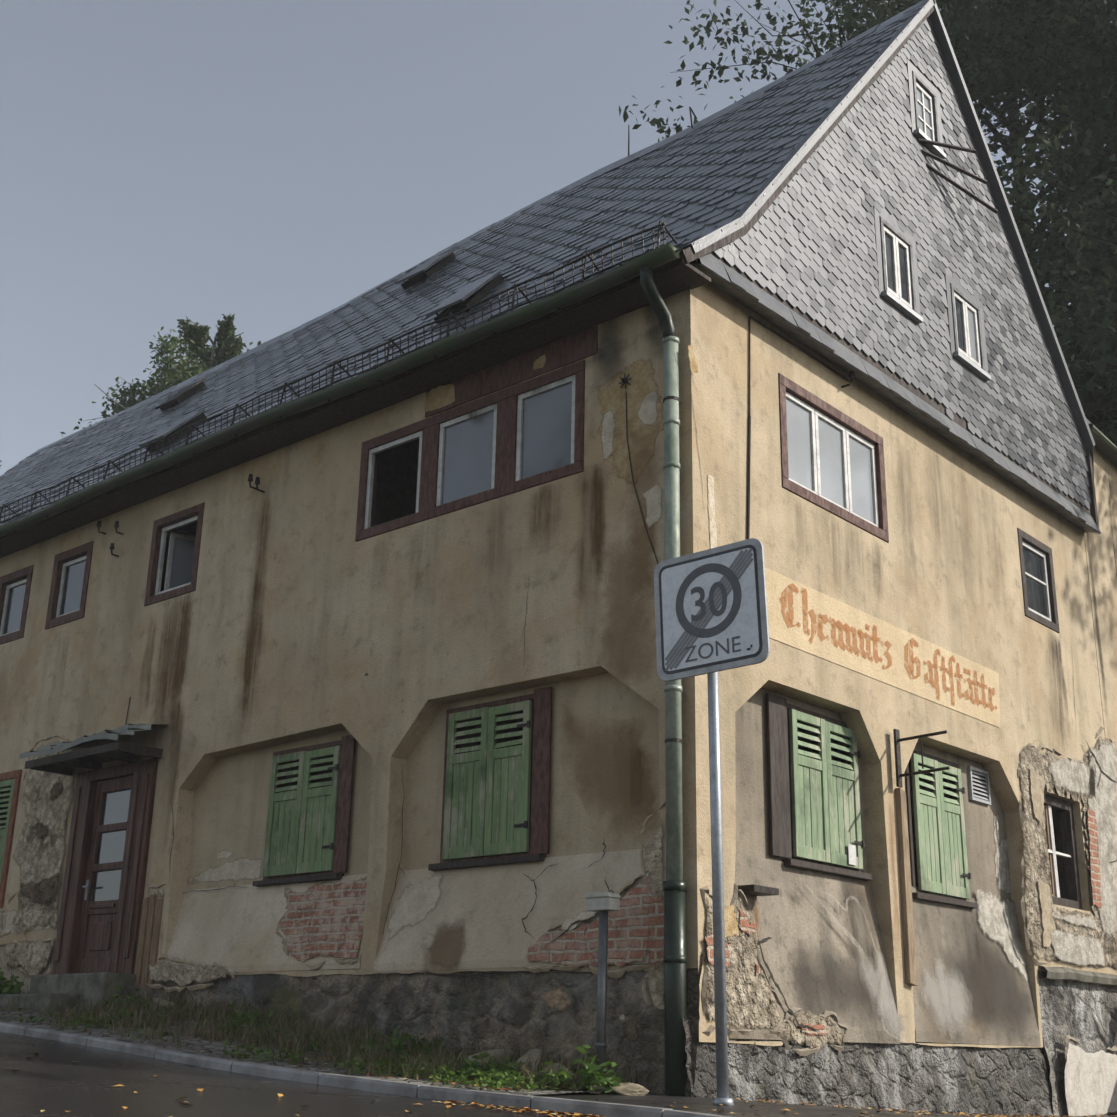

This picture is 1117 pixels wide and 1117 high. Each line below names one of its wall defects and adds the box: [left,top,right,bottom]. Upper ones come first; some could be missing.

peeling [598,359,664,527]
damp [148,603,189,752]
damp [244,511,267,703]
spalling [0,733,76,977]
spalling [275,876,367,970]
damp [424,925,464,970]
crack [376,765,648,989]
spalling [523,800,666,1011]
spalling [700,884,847,1056]
damp [798,957,890,1012]
damp [937,936,1025,1022]
spalling [976,726,1117,981]